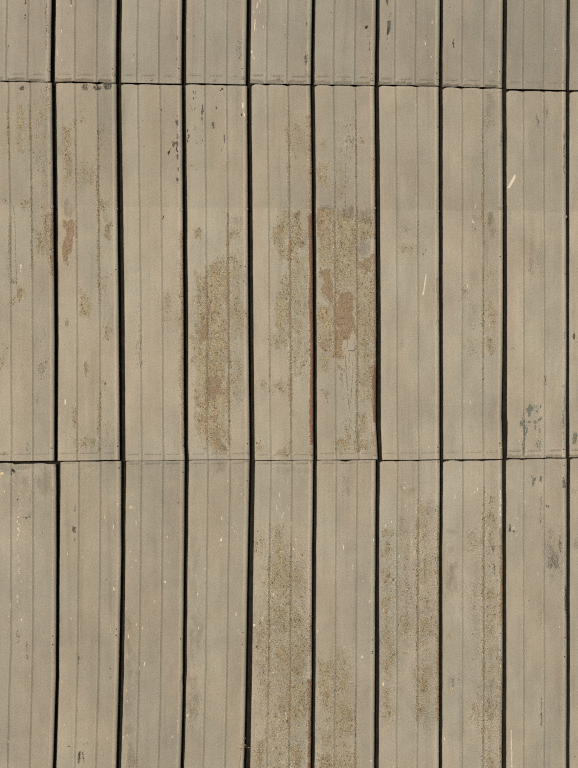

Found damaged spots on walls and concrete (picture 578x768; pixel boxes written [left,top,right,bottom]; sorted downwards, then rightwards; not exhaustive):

rust [6,87,114,318]
rust [161,213,247,457]
rust [260,101,378,457]
peeling [520,401,542,456]
rust [380,500,440,730]